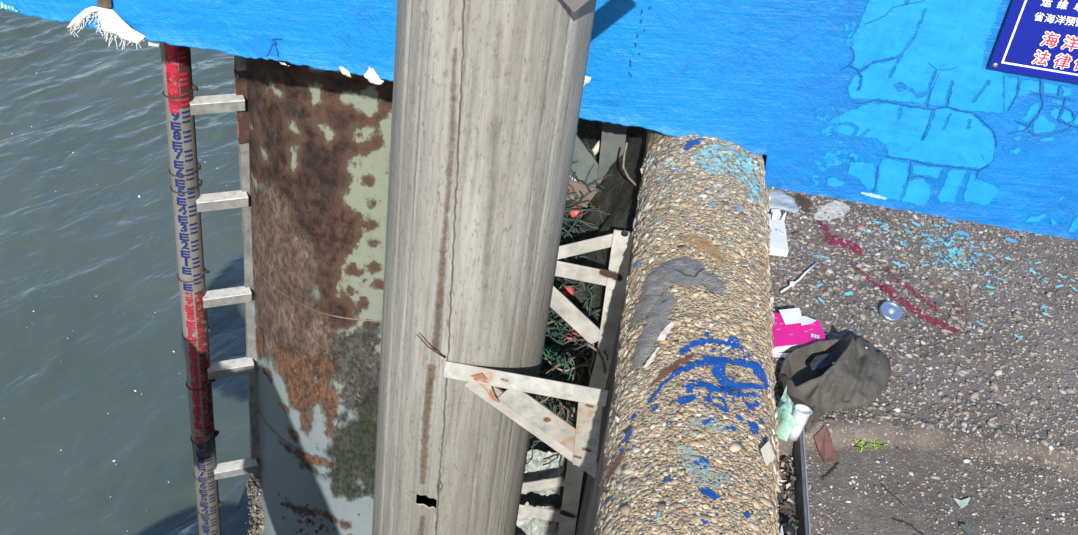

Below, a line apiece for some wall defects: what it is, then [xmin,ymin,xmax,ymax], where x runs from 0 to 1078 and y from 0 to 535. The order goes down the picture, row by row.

peeling [809,0,1078,206]
crack [841,46,1078,194]
corrosion [246,58,393,468]
corrosion [283,503,351,529]